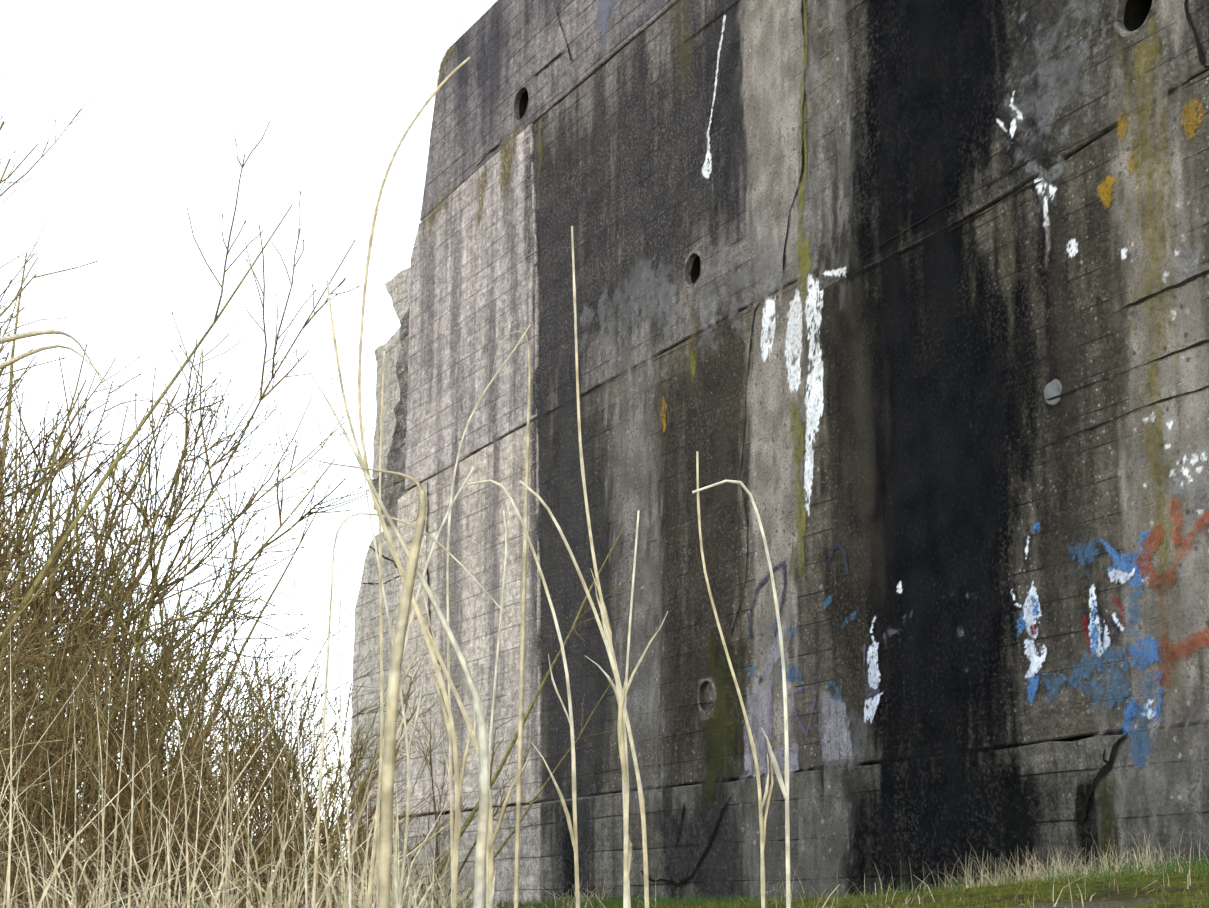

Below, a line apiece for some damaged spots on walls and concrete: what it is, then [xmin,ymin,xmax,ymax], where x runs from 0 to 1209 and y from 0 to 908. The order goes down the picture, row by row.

damp [458,0,502,131]
crack [1184,0,1209,68]
damp [420,202,463,724]
damp [484,341,498,633]
damp [503,0,1209,903]
crack [1081,730,1130,822]